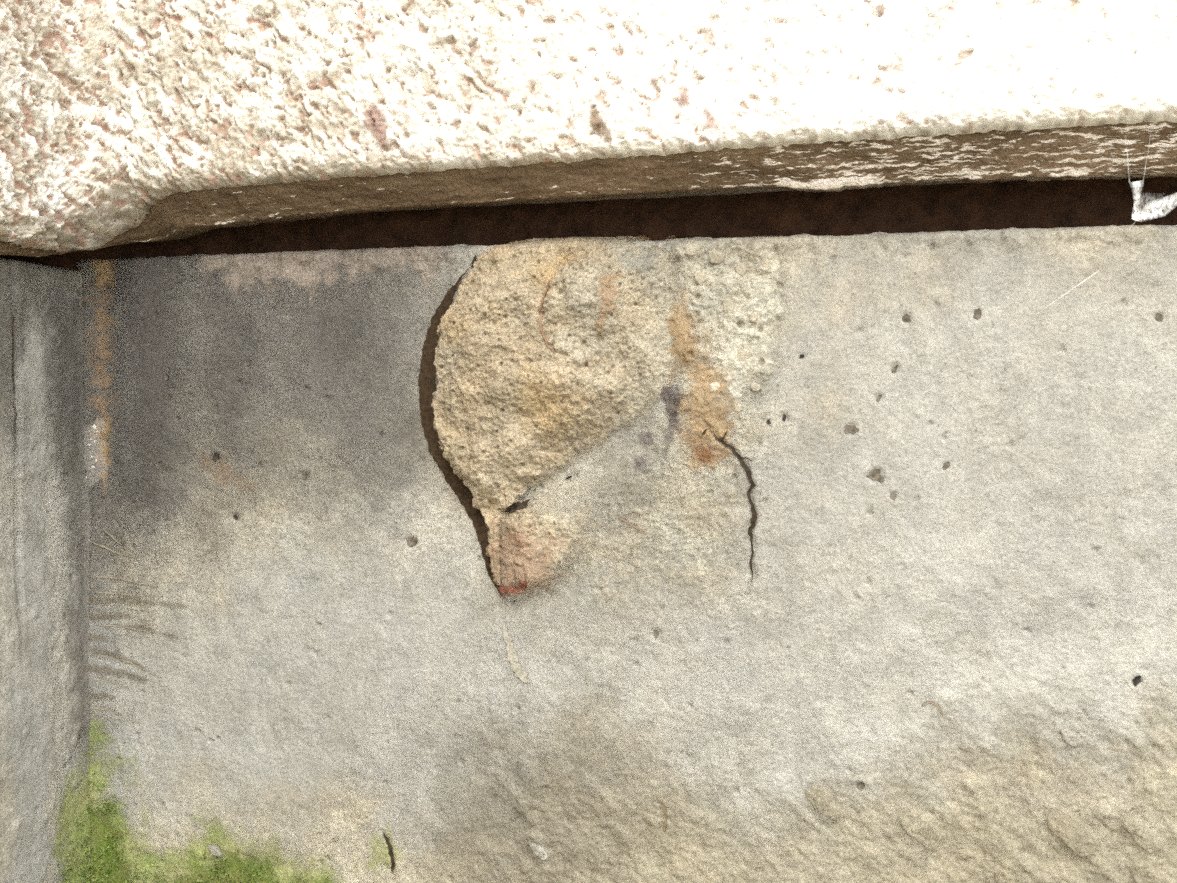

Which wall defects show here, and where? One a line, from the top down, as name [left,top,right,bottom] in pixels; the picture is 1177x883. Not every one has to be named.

rust [95,259,114,285]
rust [92,419,111,480]
crack [701,428,757,587]
water stain [0,247,1177,883]
water stain [517,804,830,883]
water stain [930,812,1177,883]